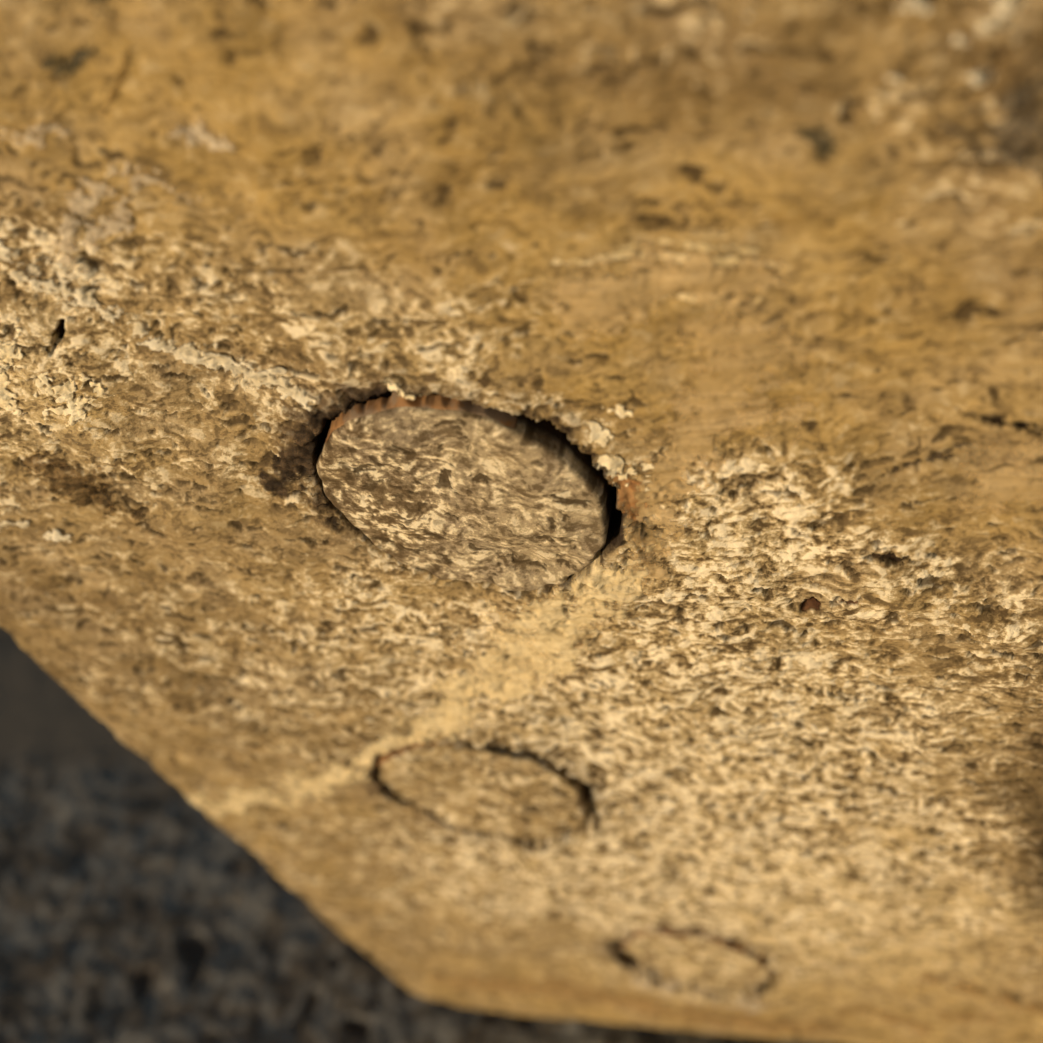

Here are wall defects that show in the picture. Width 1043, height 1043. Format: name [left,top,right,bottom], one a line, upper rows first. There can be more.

corrosion [610,473,650,523]
peeling [182,244,815,820]
spalling [801,597,821,611]